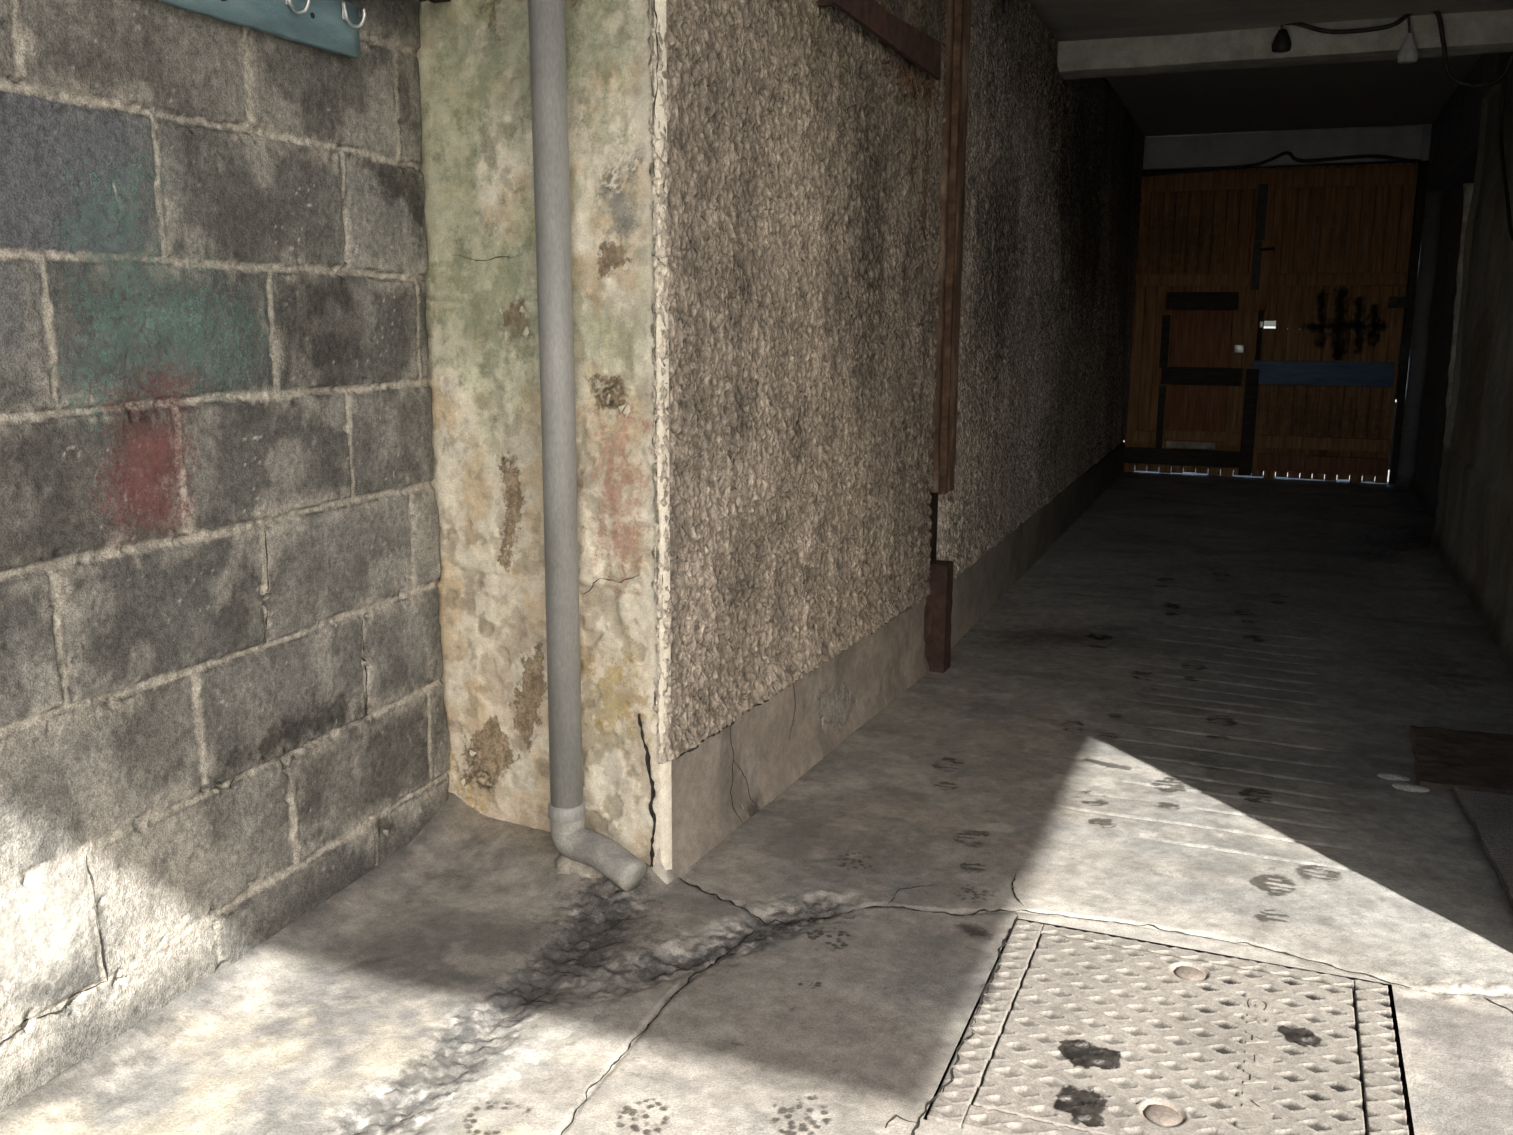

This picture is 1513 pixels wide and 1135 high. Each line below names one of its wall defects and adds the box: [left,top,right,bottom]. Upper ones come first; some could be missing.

spalling [489,451,525,571]
spalling [460,642,548,791]
crack [561,611,1410,1135]